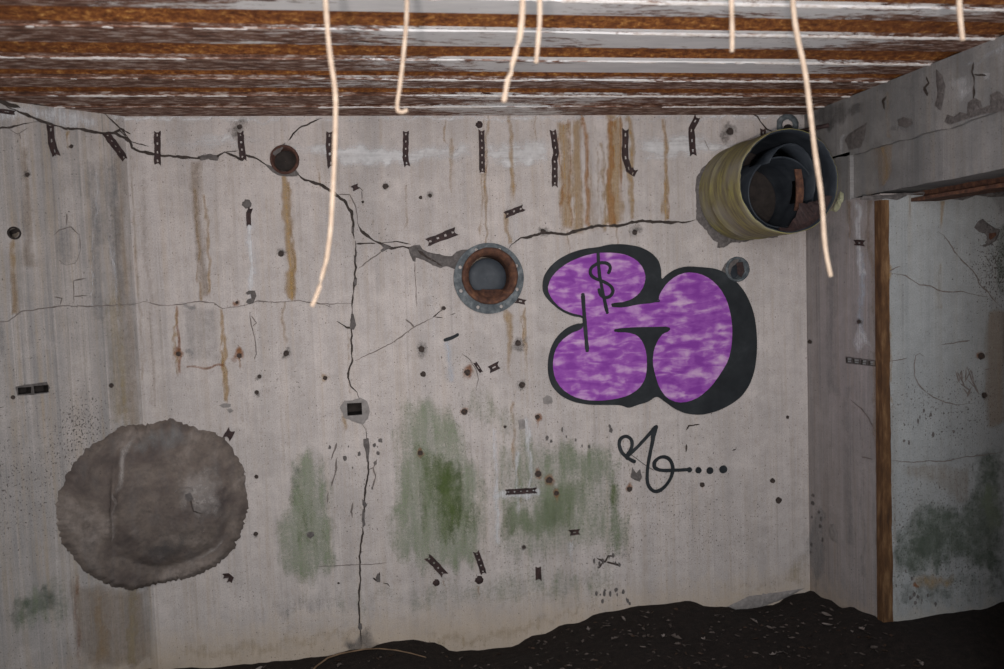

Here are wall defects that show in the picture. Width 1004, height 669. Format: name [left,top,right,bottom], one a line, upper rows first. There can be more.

crack [0,100,266,165]
corrosion [559,115,590,227]
corrosion [603,115,634,225]
crack [0,175,430,397]
corrosion [282,176,296,300]
crack [317,427,382,647]
leakage [895,455,1000,572]